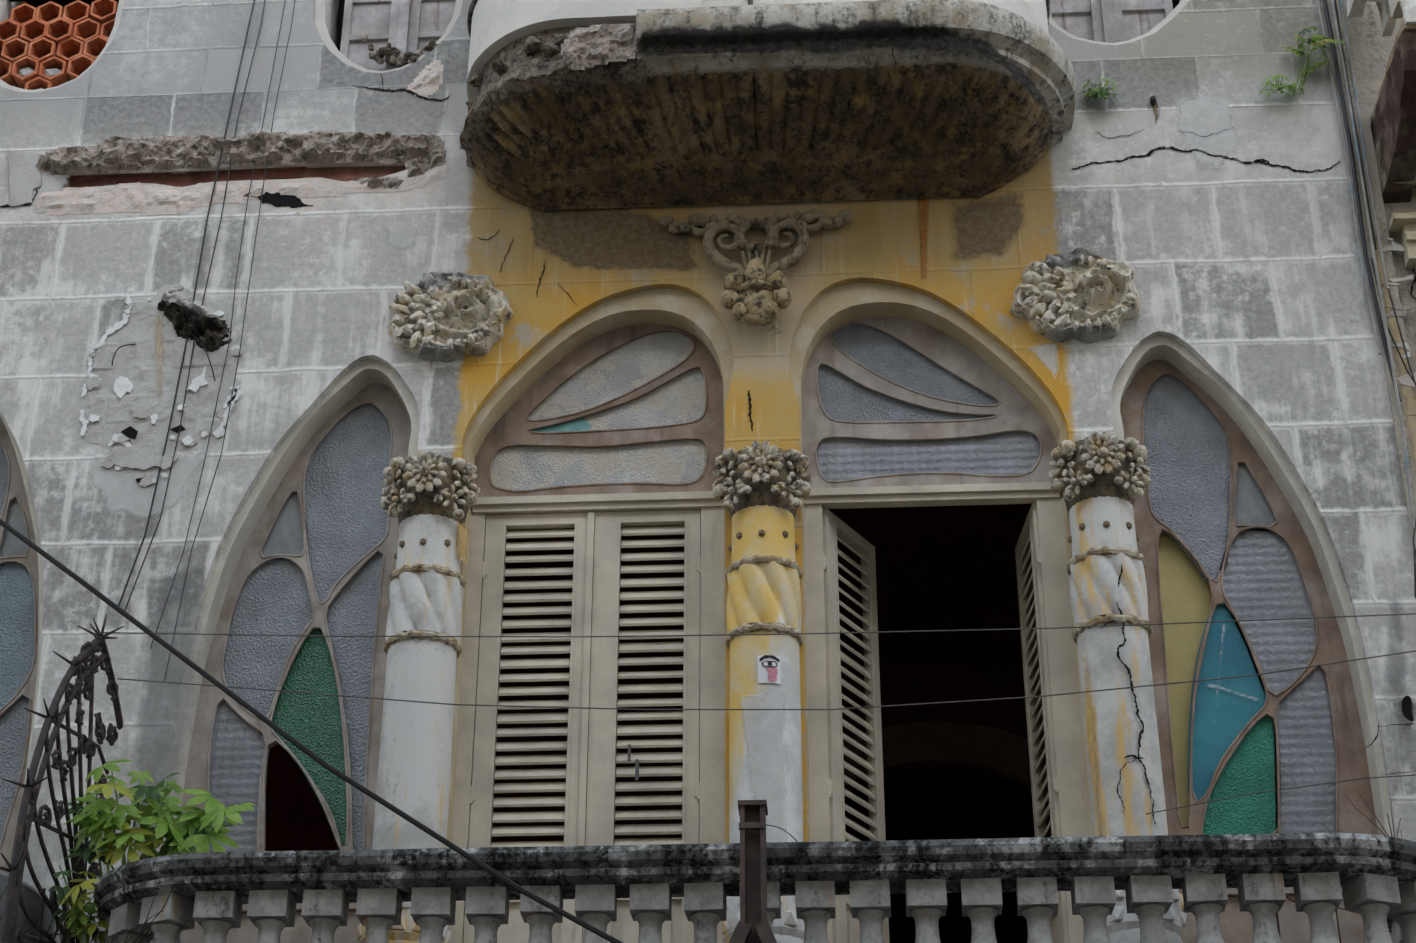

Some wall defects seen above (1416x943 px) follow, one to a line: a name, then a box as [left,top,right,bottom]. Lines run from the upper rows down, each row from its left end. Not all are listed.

crack [0,189,37,212]
spalling [8,23,647,216]
water stain [529,207,696,271]
crack [1071,103,1340,173]
peeling [79,284,242,488]
crack [1101,564,1156,825]